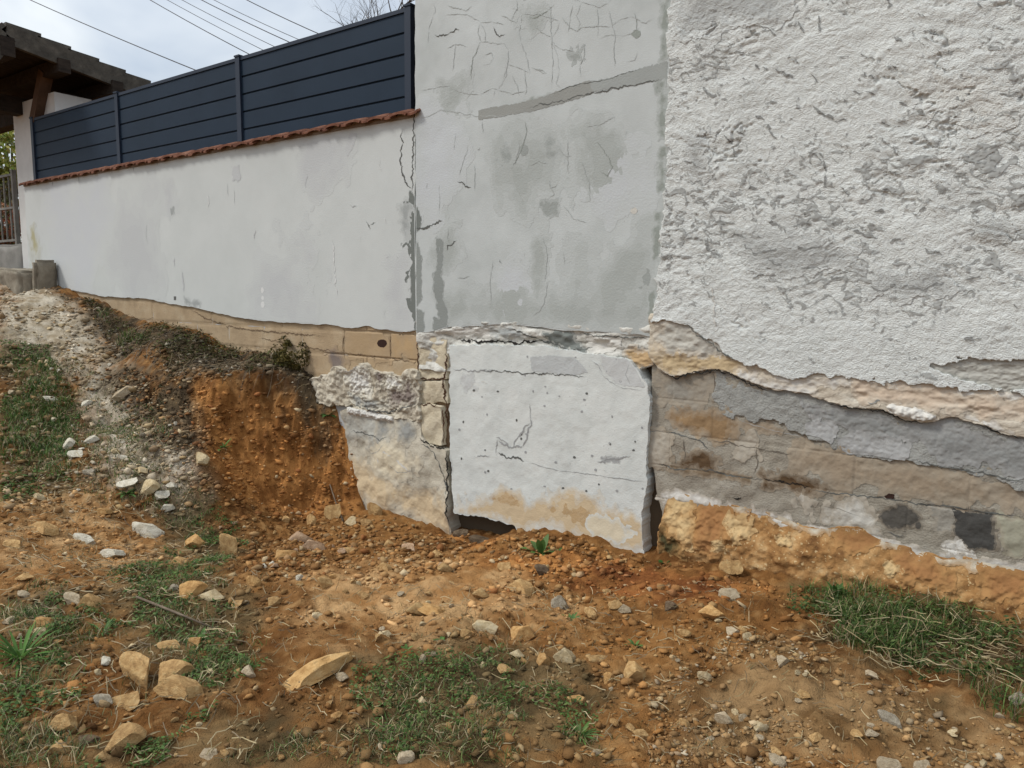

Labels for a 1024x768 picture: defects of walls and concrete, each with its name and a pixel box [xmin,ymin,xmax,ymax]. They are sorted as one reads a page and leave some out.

crack [399,0,656,249]
damp [327,66,670,451]
spalling [653,320,732,360]
crack [196,239,646,521]
spalling [930,357,1024,394]
spalling [641,426,675,470]
spalling [725,428,763,463]
crack [474,404,1023,517]
spalling [661,494,697,551]
spalling [710,510,758,553]
damp [653,447,1024,574]
spalling [882,560,905,579]